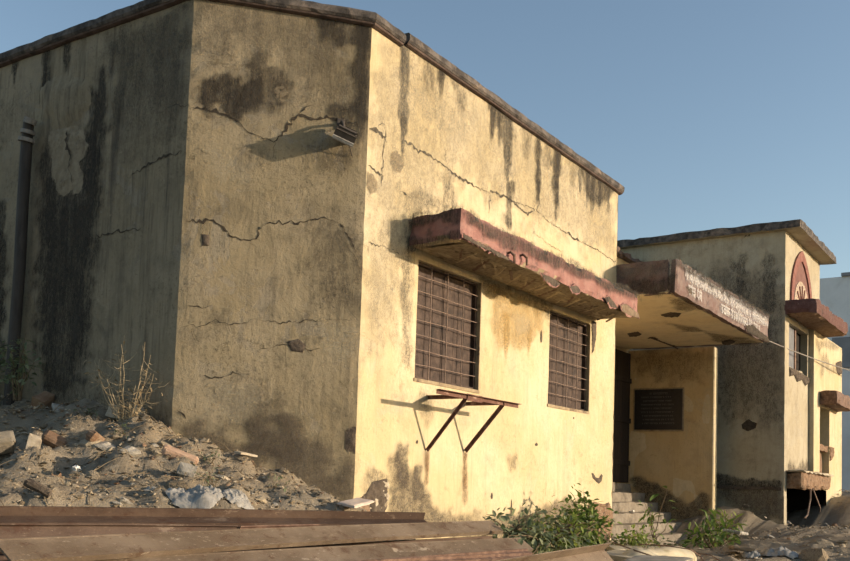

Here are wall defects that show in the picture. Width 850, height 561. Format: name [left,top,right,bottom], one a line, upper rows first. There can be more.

damp [198,52,294,122]
damp [398,45,410,153]
peeling [47,125,89,197]
damp [32,5,186,402]
crack [127,149,182,178]
crack [186,214,399,269]
crack [194,105,616,262]
spalling [425,233,640,353]
damp [401,104,782,421]
spalling [360,478,389,512]
damp [368,445,470,522]
damp [493,500,584,538]